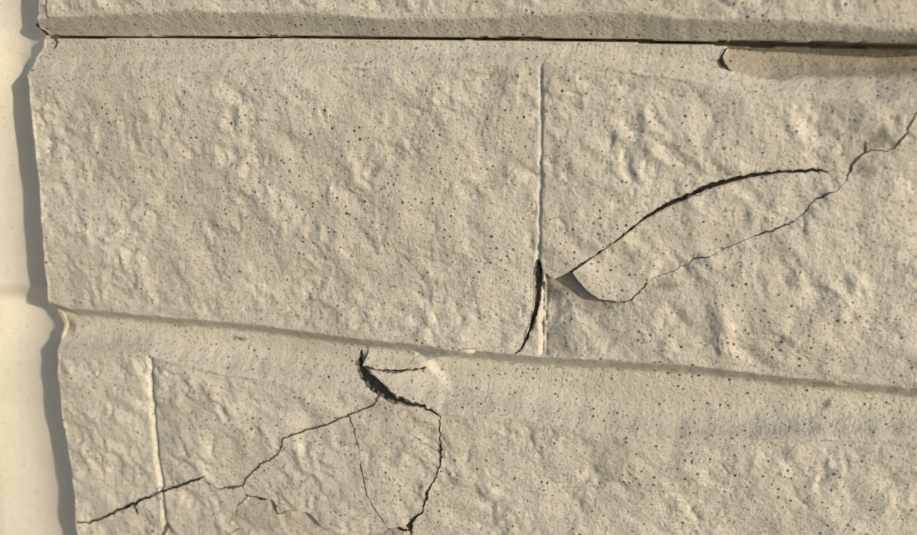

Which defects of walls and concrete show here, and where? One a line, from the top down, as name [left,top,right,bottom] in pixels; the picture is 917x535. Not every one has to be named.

crack [570,112,917,303]
crack [514,262,543,354]
crack [77,350,443,535]